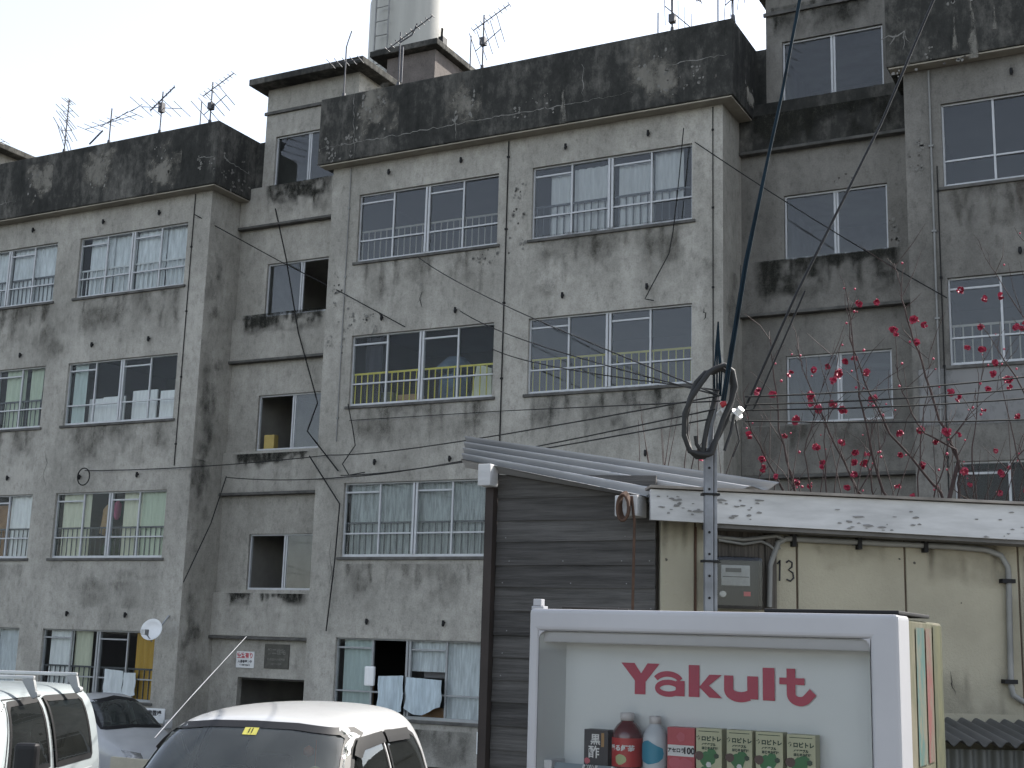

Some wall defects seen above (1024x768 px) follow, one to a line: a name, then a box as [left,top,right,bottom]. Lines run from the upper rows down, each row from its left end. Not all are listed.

peeling [317,87,399,166]
crack [318,91,632,149]
water stain [269,176,329,201]
water stain [758,247,897,296]
water stain [244,307,321,329]
peeling [657,496,703,515]
peeling [717,499,764,520]
peeling [835,509,895,531]
water stain [230,593,302,603]